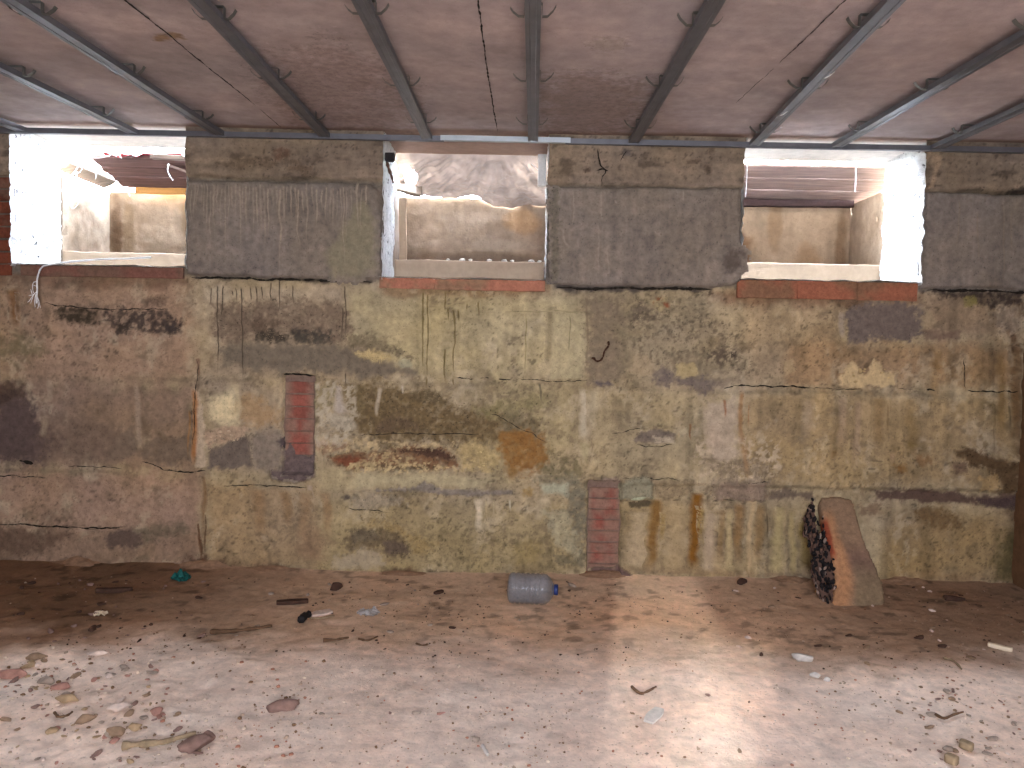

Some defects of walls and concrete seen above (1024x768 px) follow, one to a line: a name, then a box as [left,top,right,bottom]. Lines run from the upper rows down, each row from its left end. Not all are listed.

crack [477,0,498,130]
leakage [0,145,817,577]
crack [724,383,855,391]
crack [963,360,1018,393]
crack [0,460,43,478]
crack [145,462,205,473]
crack [231,482,306,490]
crack [0,522,126,530]
corrosion [642,498,667,575]
corrosion [685,491,706,573]